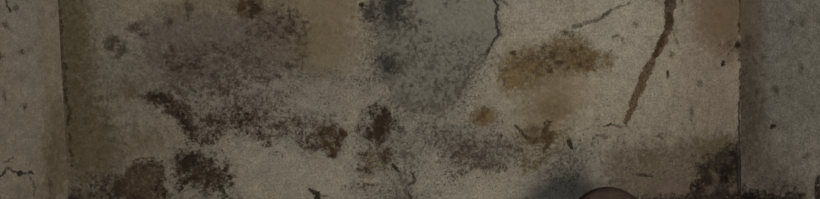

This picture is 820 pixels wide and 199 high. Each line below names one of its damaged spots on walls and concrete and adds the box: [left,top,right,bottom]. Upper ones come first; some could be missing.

leakage [129,2,311,199]
mould [352,0,414,38]
mould [341,53,523,199]
crack [457,0,508,97]
crack [572,3,630,29]
rust [624,0,683,125]
leakage [605,60,805,199]